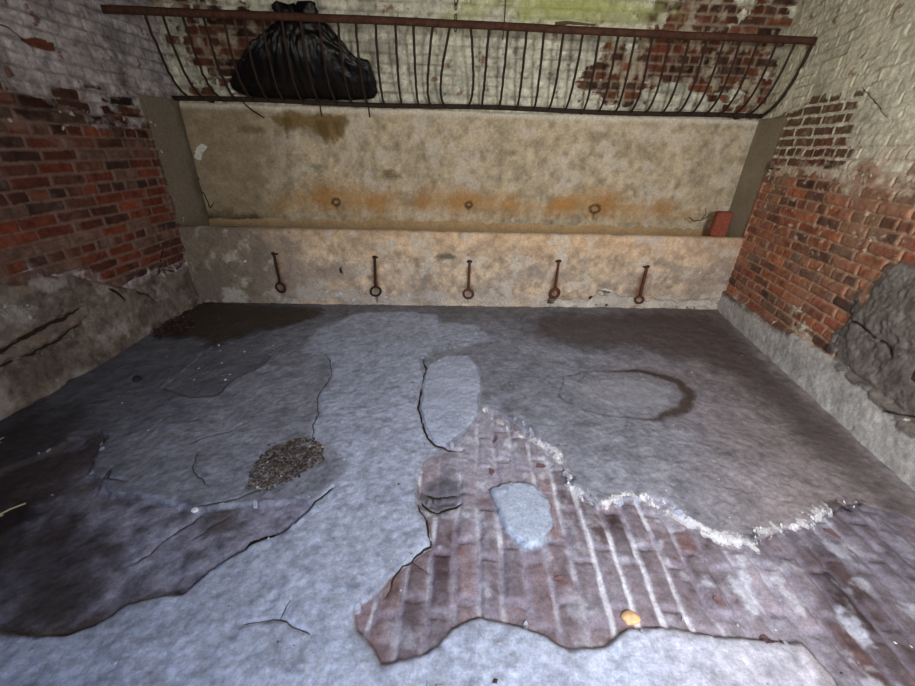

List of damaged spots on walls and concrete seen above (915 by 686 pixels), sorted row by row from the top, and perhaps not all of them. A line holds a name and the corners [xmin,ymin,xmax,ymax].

peeling [21,36,55,51]
peeling [0,67,187,292]
water stain [272,112,347,142]
peeling [575,0,800,119]
peeling [540,91,915,351]
crack [0,308,81,367]
crack [417,361,456,452]
water stain [538,315,859,469]
water stain [0,414,91,615]
spalling [354,410,915,686]